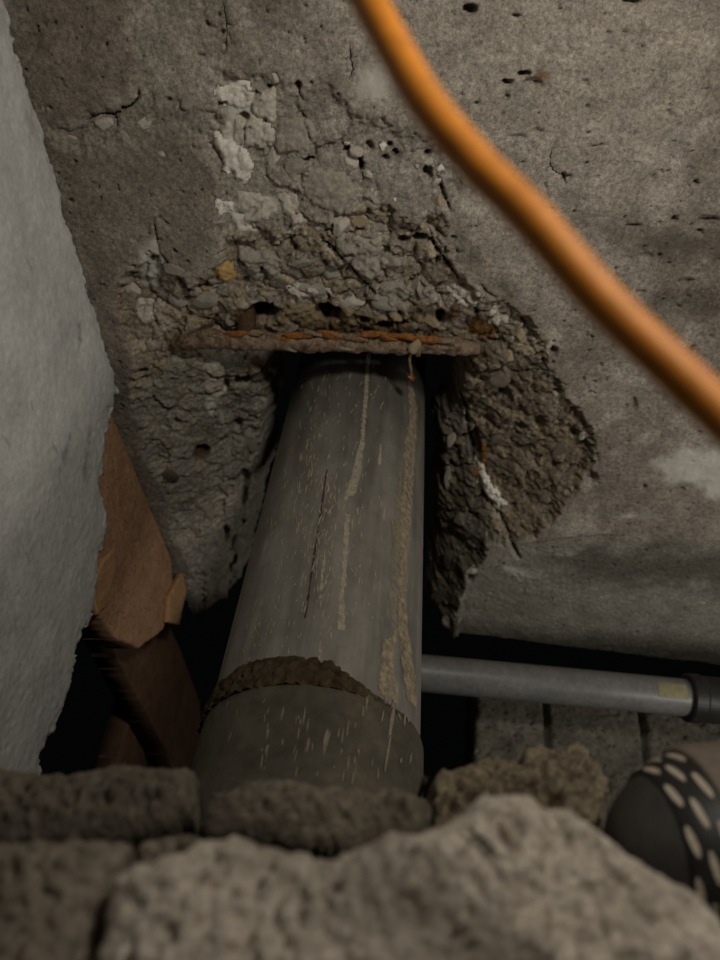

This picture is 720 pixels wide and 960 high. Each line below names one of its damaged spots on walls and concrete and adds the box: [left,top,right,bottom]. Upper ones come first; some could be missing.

crack [88,91,139,125]
rust [302,303,439,336]
spalling [47,72,600,638]